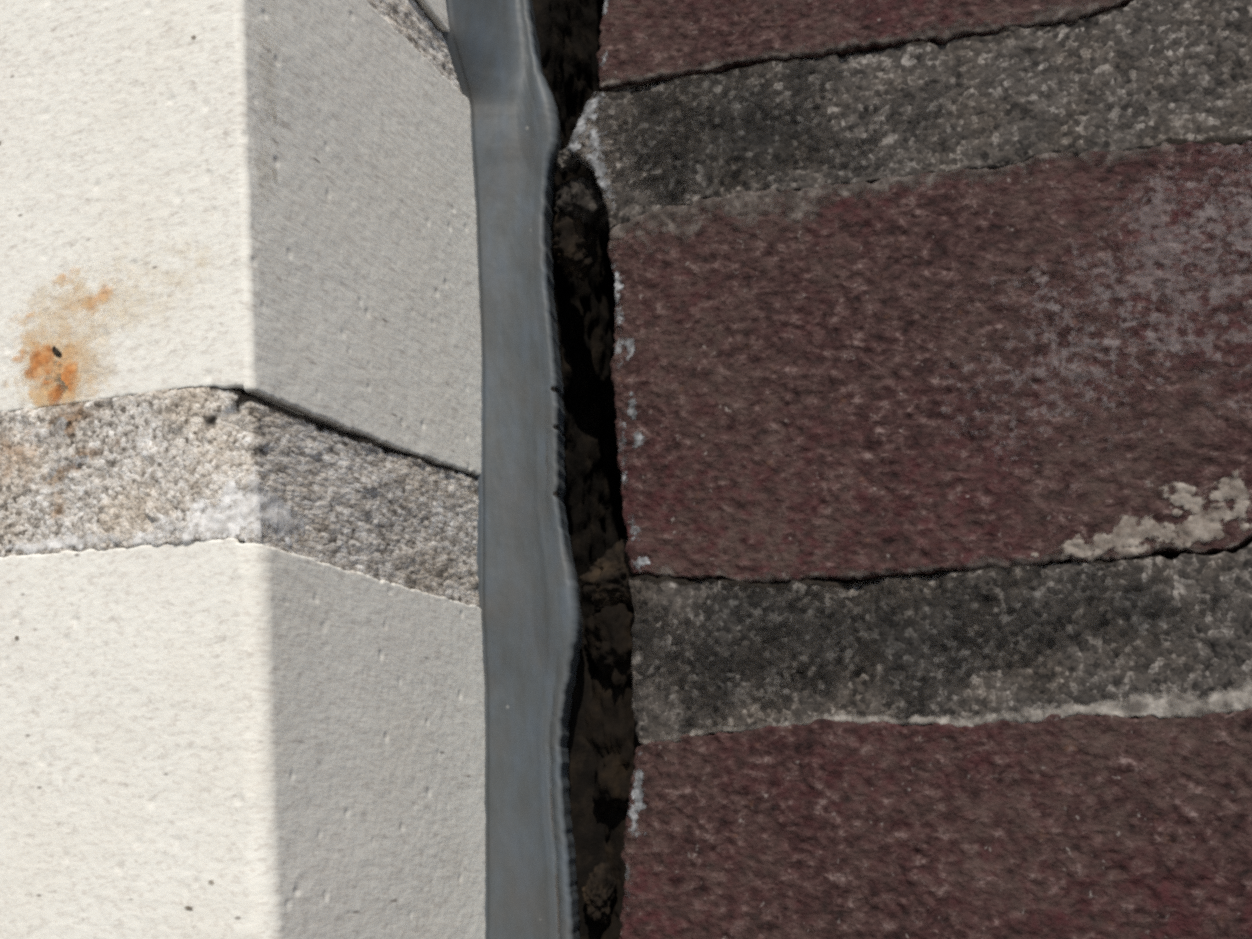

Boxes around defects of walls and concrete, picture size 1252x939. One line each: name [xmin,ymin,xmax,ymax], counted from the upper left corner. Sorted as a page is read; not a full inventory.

crack [630,7,1123,89]
corrosion [16,289,111,430]
crack [630,553,1219,589]